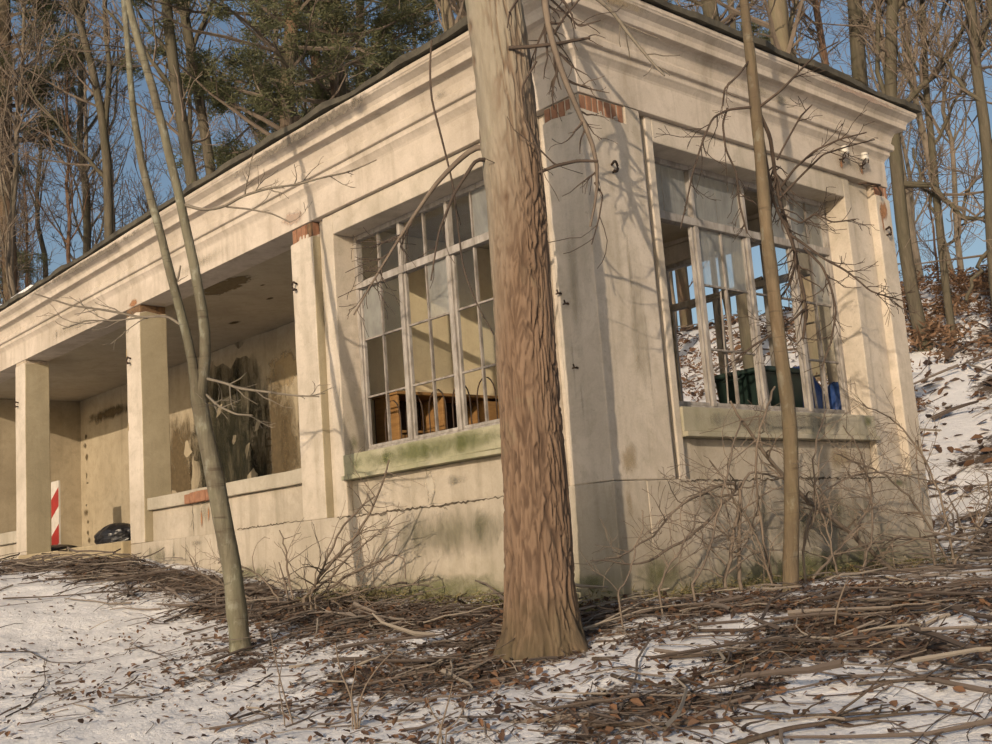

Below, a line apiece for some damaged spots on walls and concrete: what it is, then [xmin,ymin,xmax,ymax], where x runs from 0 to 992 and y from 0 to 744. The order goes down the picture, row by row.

spalling [544,93,640,126]
spalling [292,222,320,245]
spalling [204,276,250,295]
spalling [184,489,209,504]
crack [337,473,504,520]
crack [237,521,302,530]